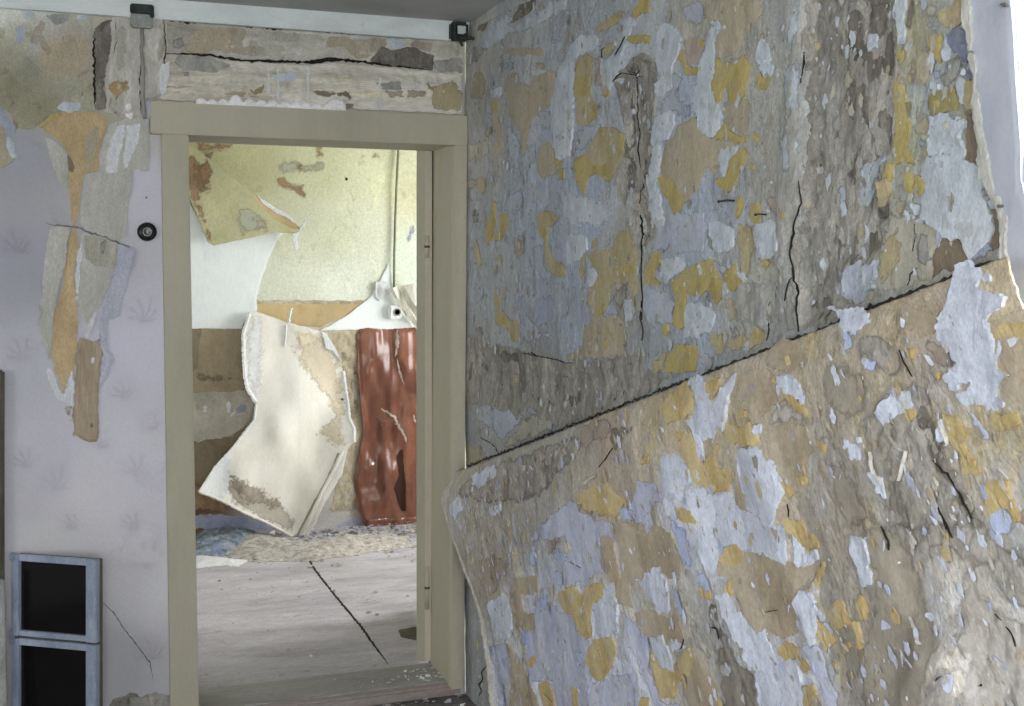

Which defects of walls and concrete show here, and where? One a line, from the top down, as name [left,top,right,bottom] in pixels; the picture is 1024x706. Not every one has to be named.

peeling [0,9,99,169]
peeling [159,61,170,95]
crack [139,20,429,114]
crack [798,52,806,83]
crack [601,36,646,341]
crack [766,180,802,341]
peeling [192,328,274,530]
flaking render [314,329,363,527]
flaking render [456,0,1022,706]
crack [103,603,154,682]
crack [310,561,388,664]